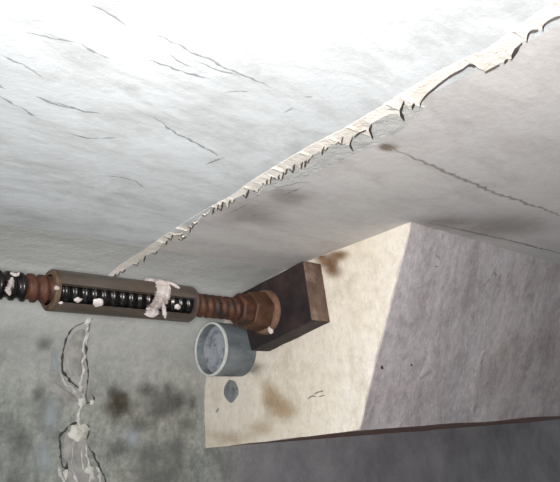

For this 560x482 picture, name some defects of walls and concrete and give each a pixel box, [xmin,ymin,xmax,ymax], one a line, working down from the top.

crack [108,0,560,277]
rust [318,252,345,274]
crack [45,317,106,482]
damp [109,391,127,415]